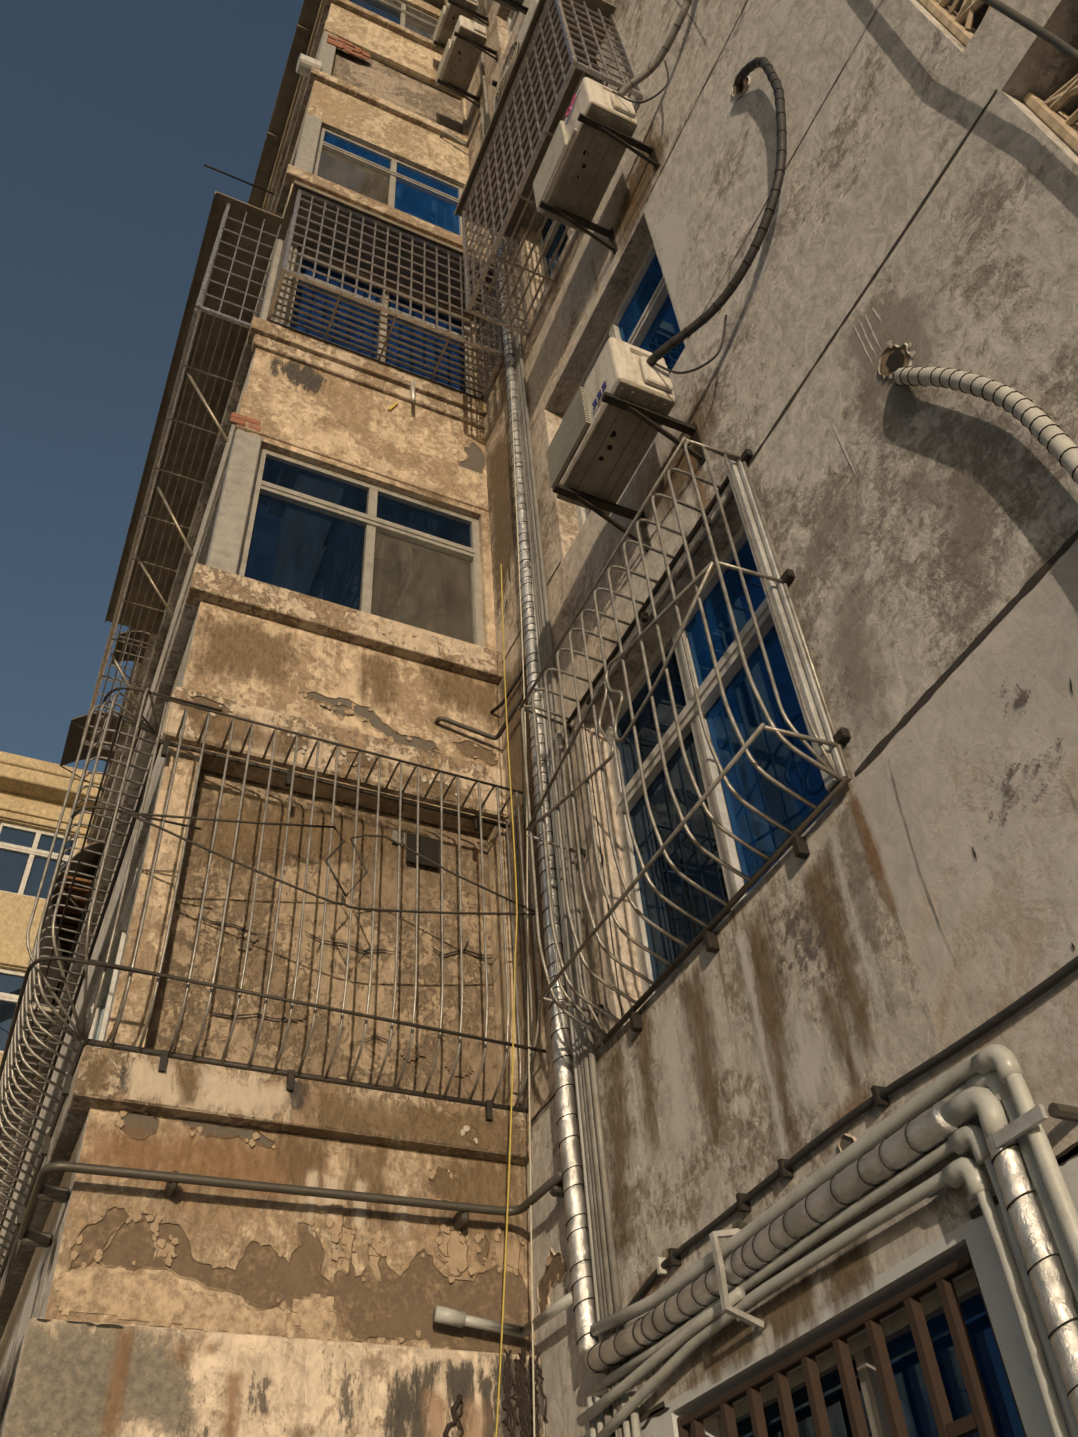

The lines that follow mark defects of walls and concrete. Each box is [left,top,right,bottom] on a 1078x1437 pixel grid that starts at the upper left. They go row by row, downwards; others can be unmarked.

water stain [735,812,884,1153]
water stain [0,1081,546,1437]
spalling [68,1202,567,1355]